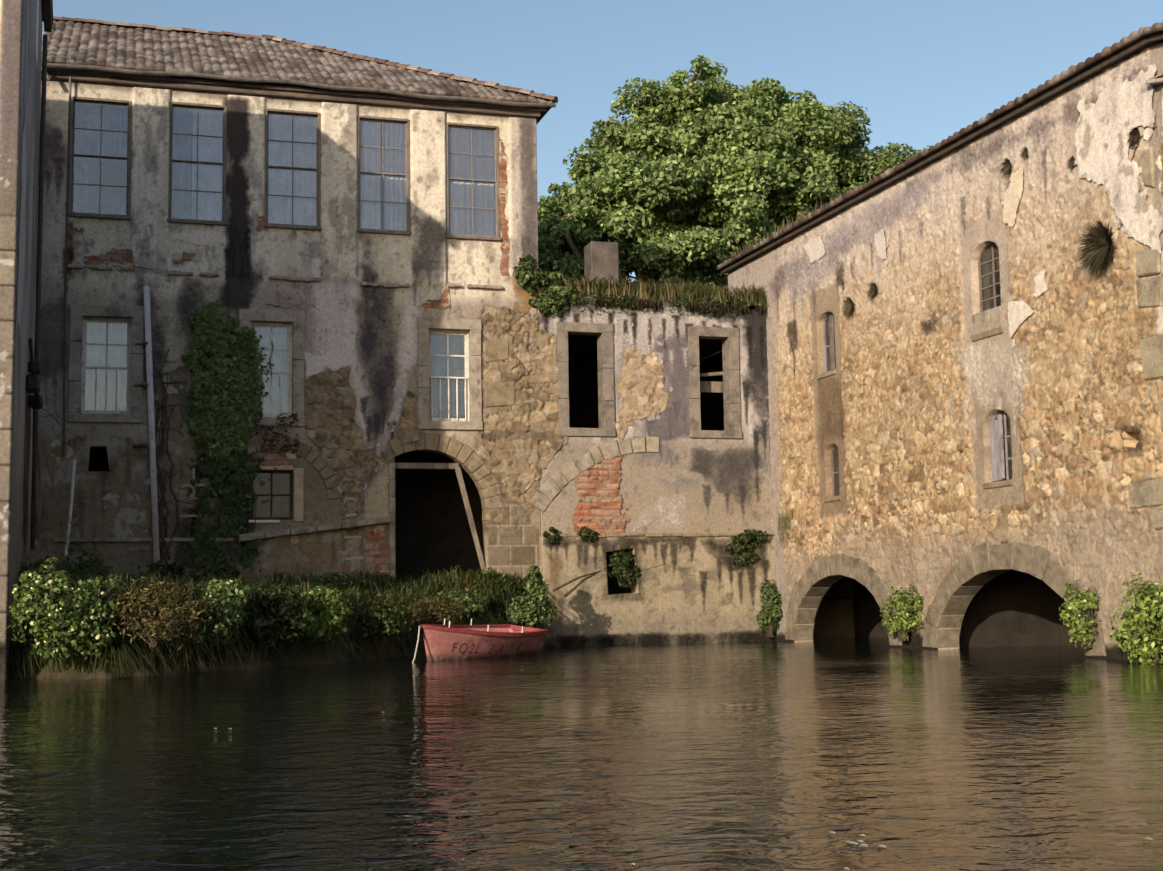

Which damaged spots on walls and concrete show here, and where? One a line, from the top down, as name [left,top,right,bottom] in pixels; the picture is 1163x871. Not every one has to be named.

flaking render [83,248,134,272]
flaking render [499,137,514,279]
water stain [786,182,930,311]
flaking render [304,364,420,503]
water stain [358,265,403,465]
flaking render [475,305,568,496]
flaking render [571,454,630,539]
flaking render [615,346,673,440]
water stain [541,299,769,512]
water stain [787,321,797,371]
water stain [819,379,844,456]